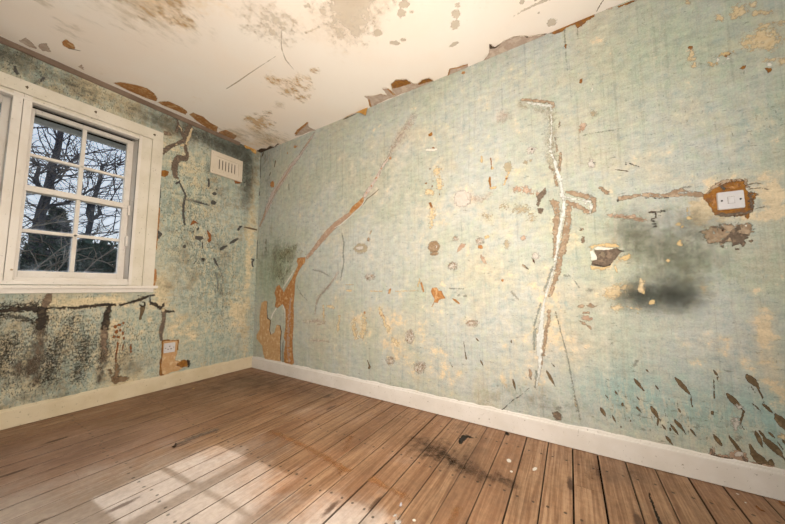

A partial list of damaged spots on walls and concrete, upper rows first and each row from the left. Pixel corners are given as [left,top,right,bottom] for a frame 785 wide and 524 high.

water stain [451,3,460,30]
flaking render [550,14,595,34]
flaking render [700,178,769,250]
flaking render [579,228,631,273]
peeling [602,278,655,311]
flaking render [256,301,282,361]
water stain [108,364,129,384]
flaking render [159,339,191,376]
flaking render [709,447,775,467]